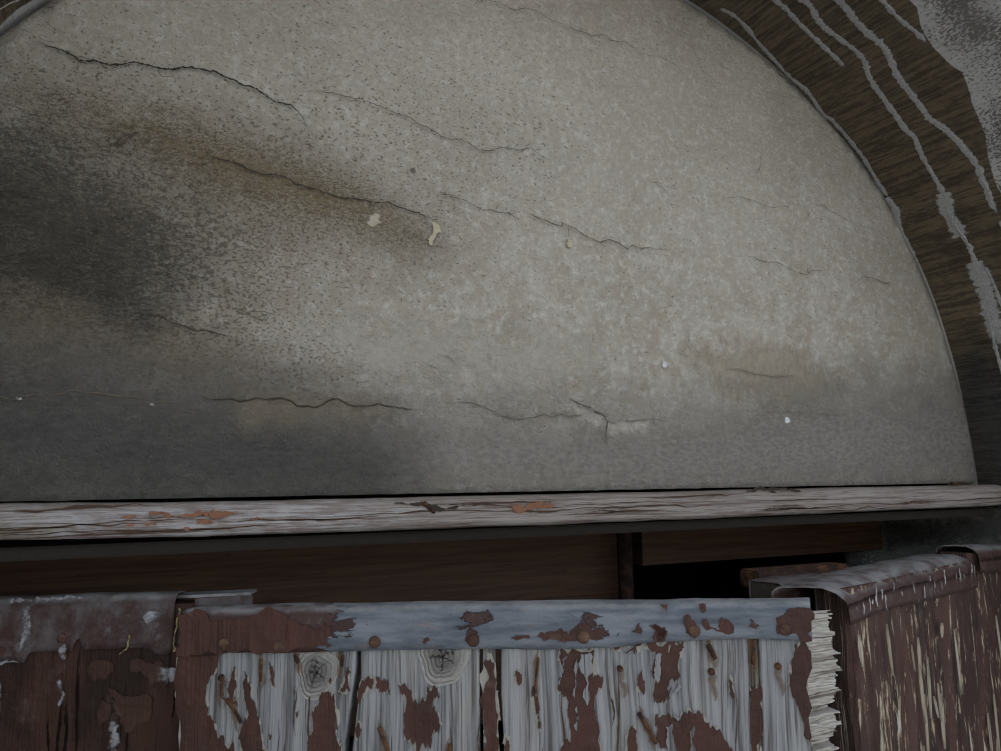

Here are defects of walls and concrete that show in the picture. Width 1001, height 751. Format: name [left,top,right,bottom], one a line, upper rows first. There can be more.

crack [39,42,543,157]
crack [207,151,665,250]
water stain [0,0,1001,499]
crack [0,389,411,425]
crack [447,399,664,441]
peeling [130,606,332,751]
peeling [307,667,440,751]
peeling [479,659,510,751]
peeling [512,623,609,751]
peeling [614,603,734,751]
peeling [749,685,763,751]
peeling [776,607,815,749]